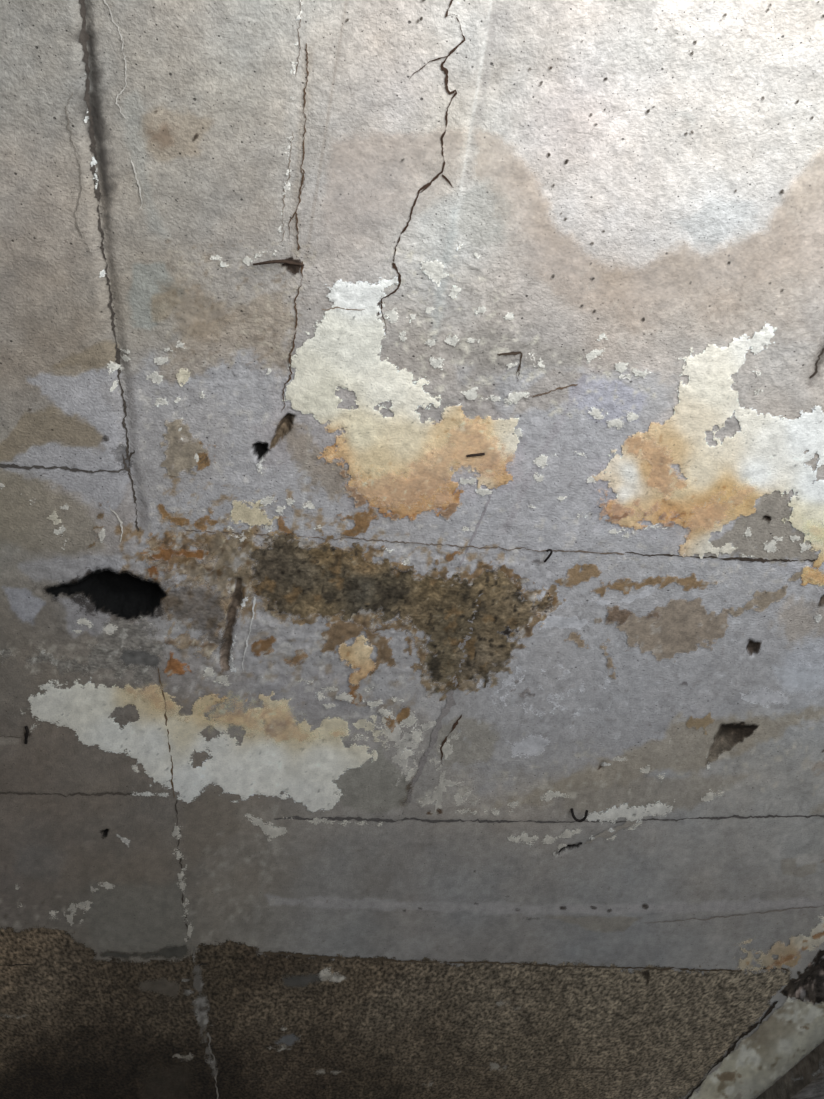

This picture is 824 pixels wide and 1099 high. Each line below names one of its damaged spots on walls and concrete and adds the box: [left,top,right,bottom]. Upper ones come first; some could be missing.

crack [0,0,139,531]
crack [281,44,309,412]
crack [323,0,466,324]
leakage [478,134,824,292]
peeling [20,578,519,841]
leakage [26,525,588,708]
corrosion [335,470,413,537]
peeling [252,276,530,520]
corrosion [440,502,462,520]
efflorescence [506,734,550,758]
corrosion [599,435,687,528]
peeling [585,323,824,623]